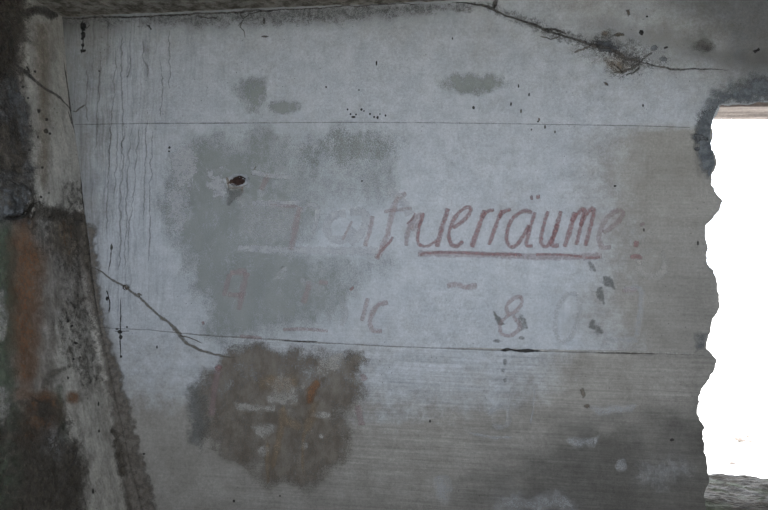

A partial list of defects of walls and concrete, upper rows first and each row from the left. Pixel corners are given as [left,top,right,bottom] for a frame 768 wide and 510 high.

crack [1,0,722,77]
crack [14,58,85,133]
crack [92,267,235,358]
damp [188,342,367,488]